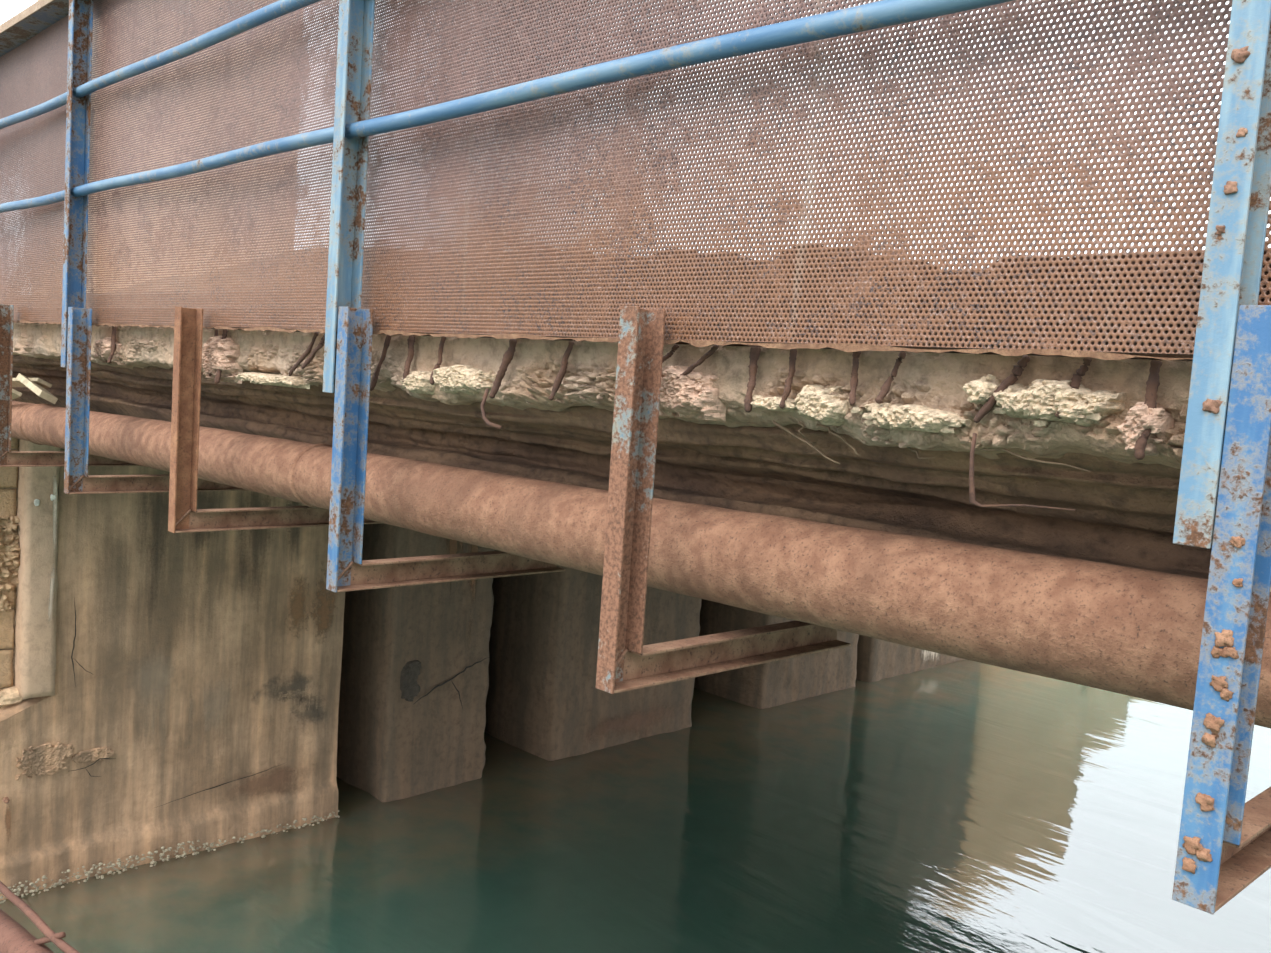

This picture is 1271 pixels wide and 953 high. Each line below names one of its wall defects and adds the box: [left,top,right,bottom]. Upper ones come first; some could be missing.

spalling [202,329,325,389]
spalling [370,335,392,391]
spalling [400,335,517,399]
spalling [549,341,574,401]
spalling [659,344,726,422]
spalling [744,346,1176,460]
spalling [0,515,21,611]
crack [414,657,489,709]
spalling [15,742,114,780]